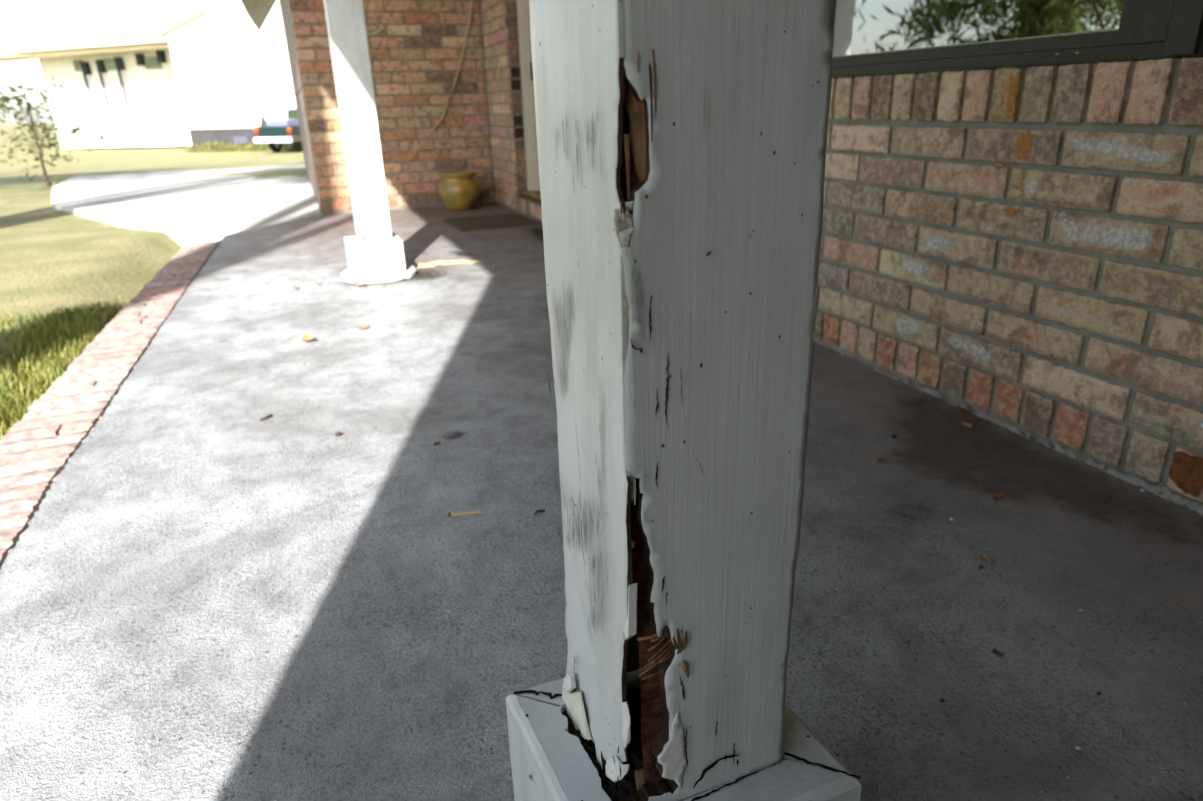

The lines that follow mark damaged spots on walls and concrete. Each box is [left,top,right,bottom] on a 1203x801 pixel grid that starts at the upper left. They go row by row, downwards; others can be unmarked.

peeling [613,203,634,247]
peeling [624,583,637,640]
crack [513,690,562,699]
peeling [562,658,591,740]
peeling [605,701,631,800]
peeling [658,712,687,789]
crack [680,676,861,801]